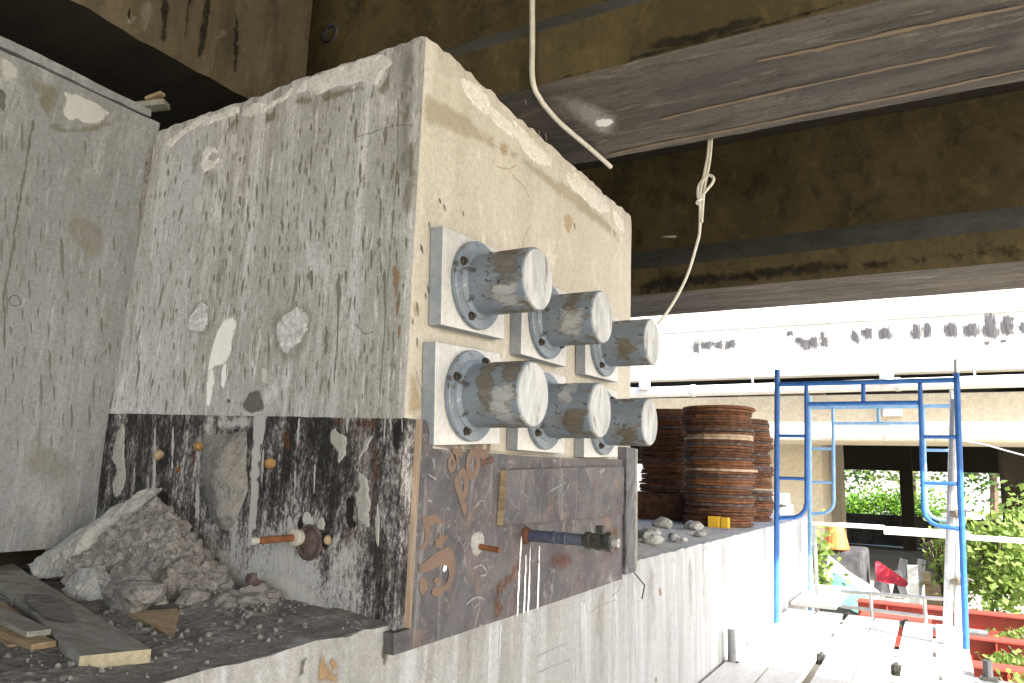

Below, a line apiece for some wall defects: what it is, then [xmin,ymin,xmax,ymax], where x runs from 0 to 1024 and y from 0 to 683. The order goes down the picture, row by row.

peeling [63,92,109,124]
peeling [166,54,393,149]
peeling [461,78,553,166]
peeling [567,172,625,233]
spalling [188,301,208,332]
damp [642,262,847,295]
peeling [112,423,126,497]
damp [219,391,267,548]
damp [236,390,324,606]
peeling [330,428,380,547]